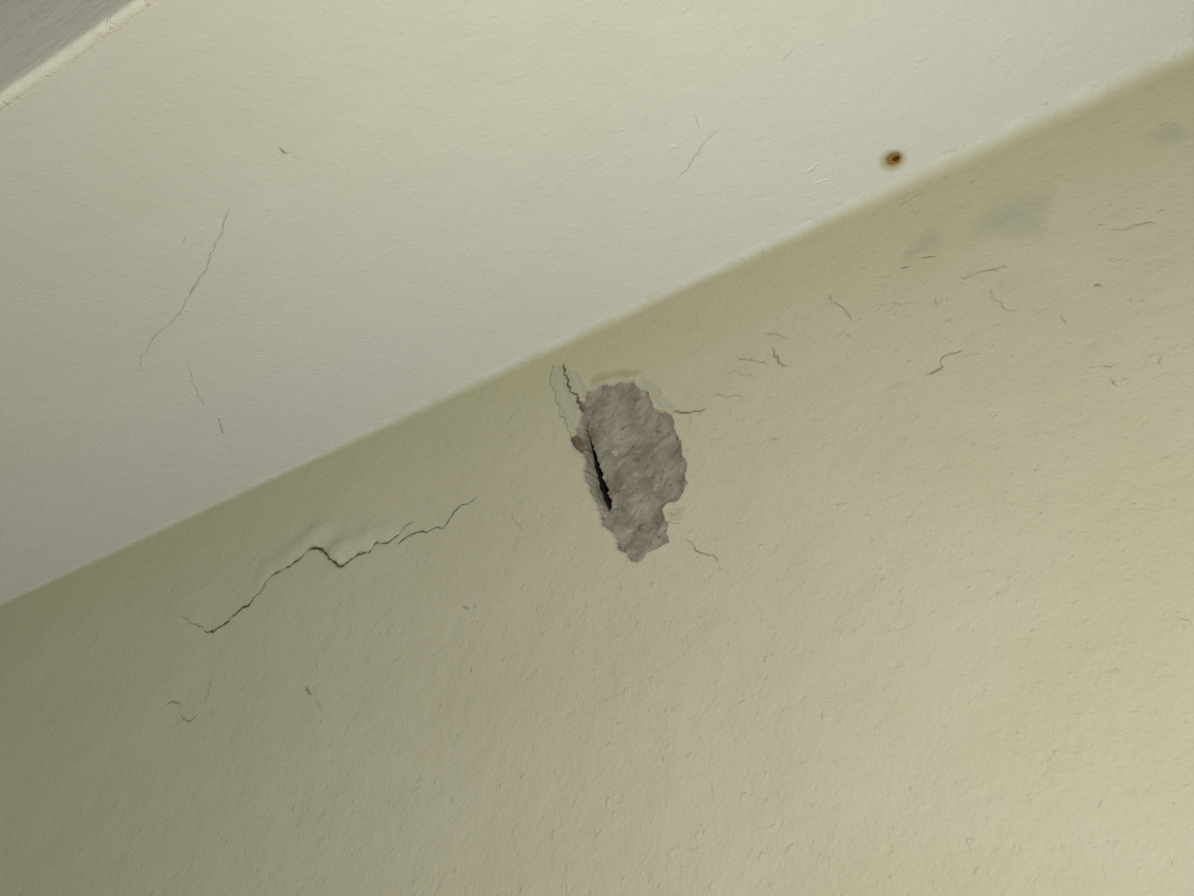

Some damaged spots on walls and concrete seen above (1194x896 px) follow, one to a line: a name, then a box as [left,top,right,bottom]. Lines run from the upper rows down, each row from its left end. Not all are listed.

corrosion [884,152,902,167]
flaking render [554,367,689,564]
crack [207,499,474,633]